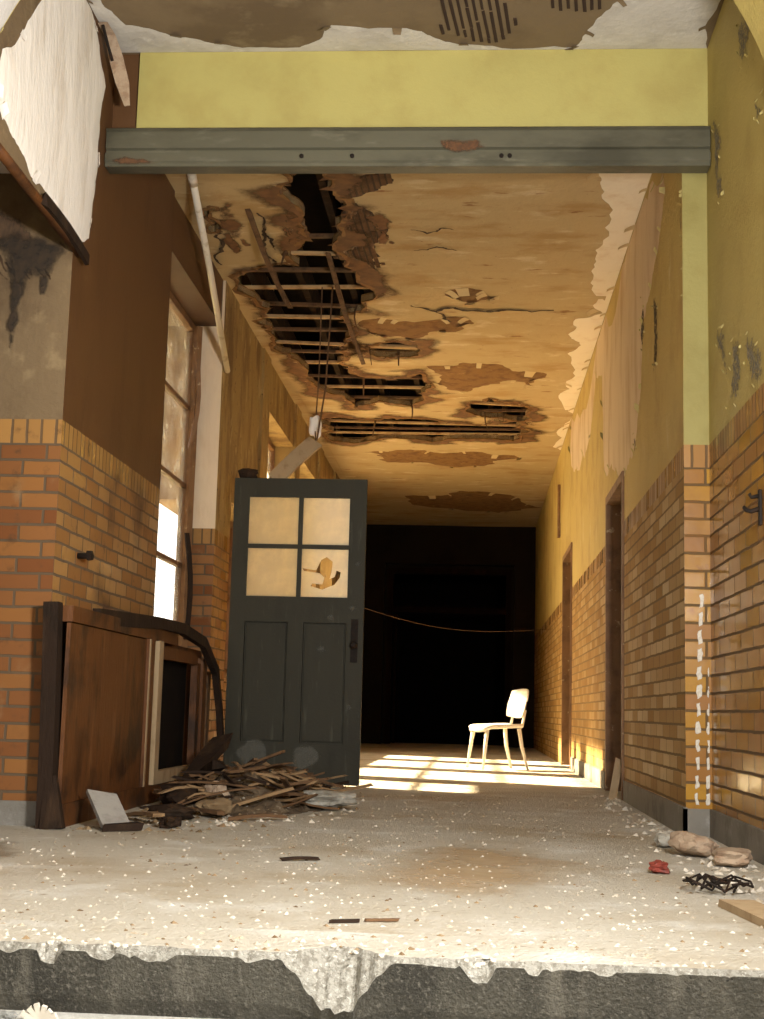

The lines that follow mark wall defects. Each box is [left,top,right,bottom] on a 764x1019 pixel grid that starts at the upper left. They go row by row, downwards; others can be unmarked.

peeling [0,0,720,242]
leakage [0,212,63,343]
peeling [445,288,499,305]
peeling [357,316,474,341]
peeling [553,173,665,476]
peeling [427,363,547,394]
spalling [36,940,64,963]
spalling [85,942,180,962]
spalling [280,946,394,1014]
spalling [460,957,497,983]